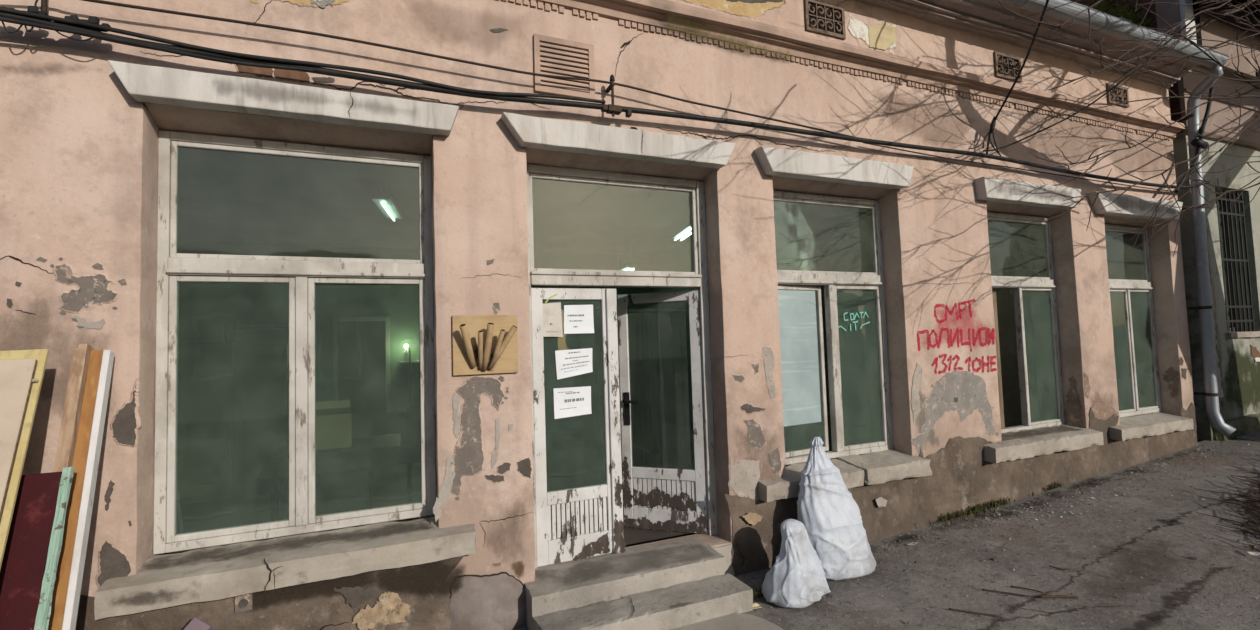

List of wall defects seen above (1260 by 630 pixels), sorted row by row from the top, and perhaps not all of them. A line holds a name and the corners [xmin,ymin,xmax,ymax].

peeling [250,0,349,9]
peeling [681,0,786,20]
crack [615,33,643,76]
crack [1,256,51,274]
flaking render [37,257,127,329]
flaking render [732,362,759,383]
spalling [110,378,141,448]
peeling [911,362,999,456]
peeling [433,375,533,521]
flaking render [740,403,782,475]
spalling [95,541,134,588]